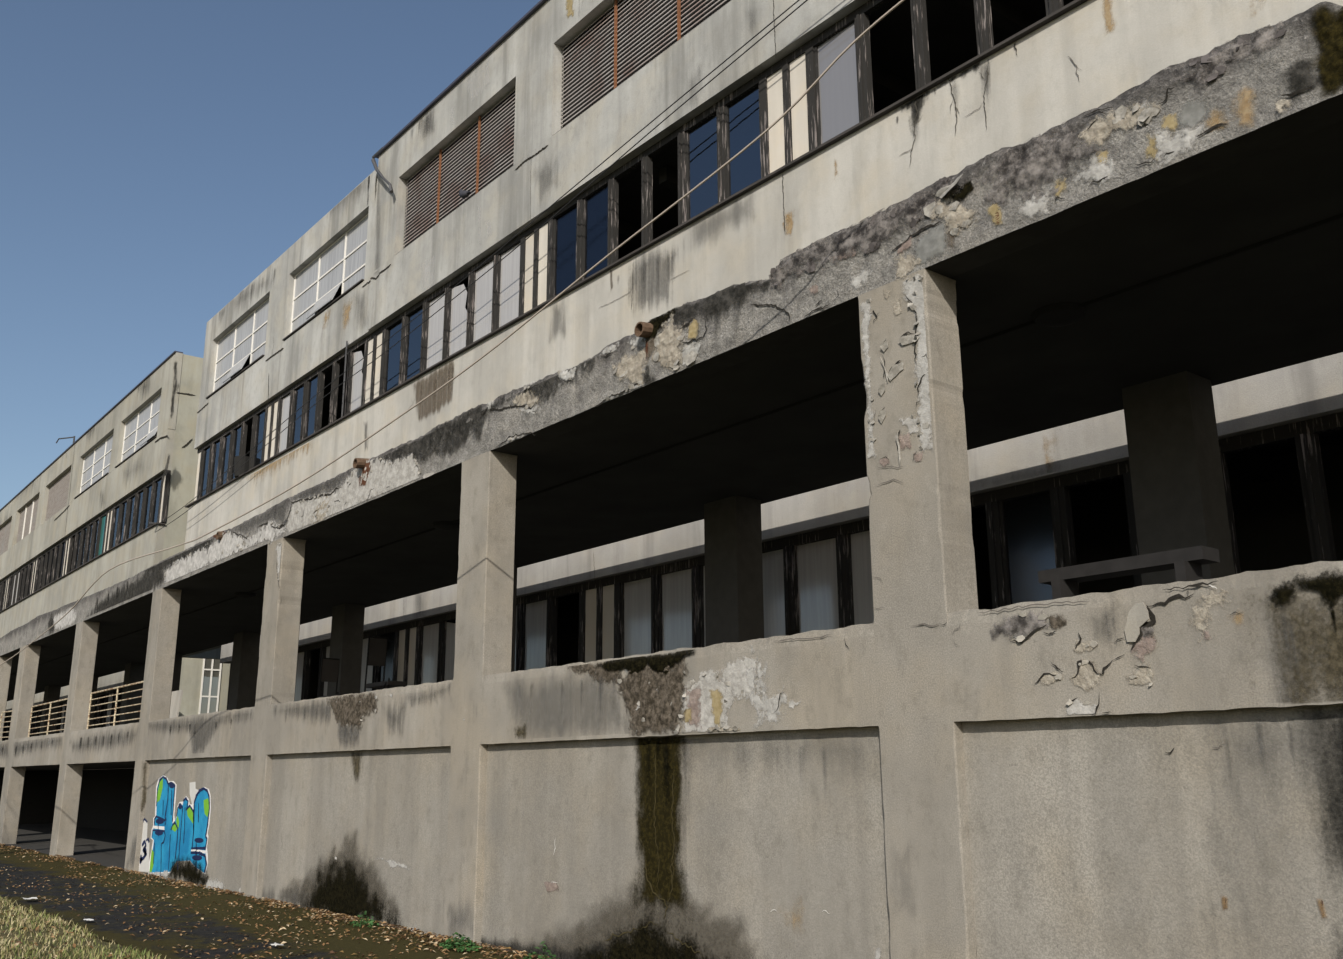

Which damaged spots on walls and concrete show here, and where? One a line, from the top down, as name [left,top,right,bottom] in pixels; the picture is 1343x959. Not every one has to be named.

crack [901,46,1017,167]
crack [1068,56,1112,132]
spalling [1179,21,1286,85]
spalling [1275,59,1323,113]
spalling [757,101,1160,467]
spalling [603,313,701,401]
peeling [164,453,435,585]
spalling [568,648,801,736]
spalling [991,611,1103,715]
water stain [1314,708,1343,865]
water stain [285,836,407,916]
water stain [481,891,753,959]